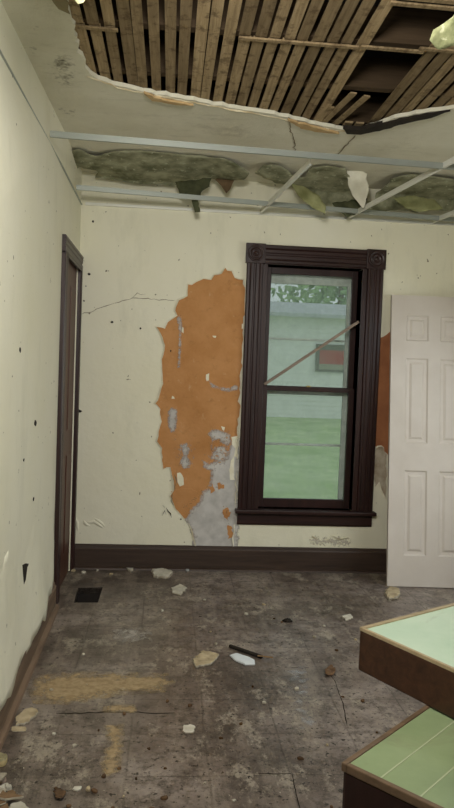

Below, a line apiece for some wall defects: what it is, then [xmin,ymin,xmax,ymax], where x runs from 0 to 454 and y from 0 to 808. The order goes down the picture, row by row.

flaking render [144,91,194,106]
flaking render [288,118,339,134]
crack [84,293,174,313]
flaking render [154,267,246,547]
flaking render [374,332,390,499]